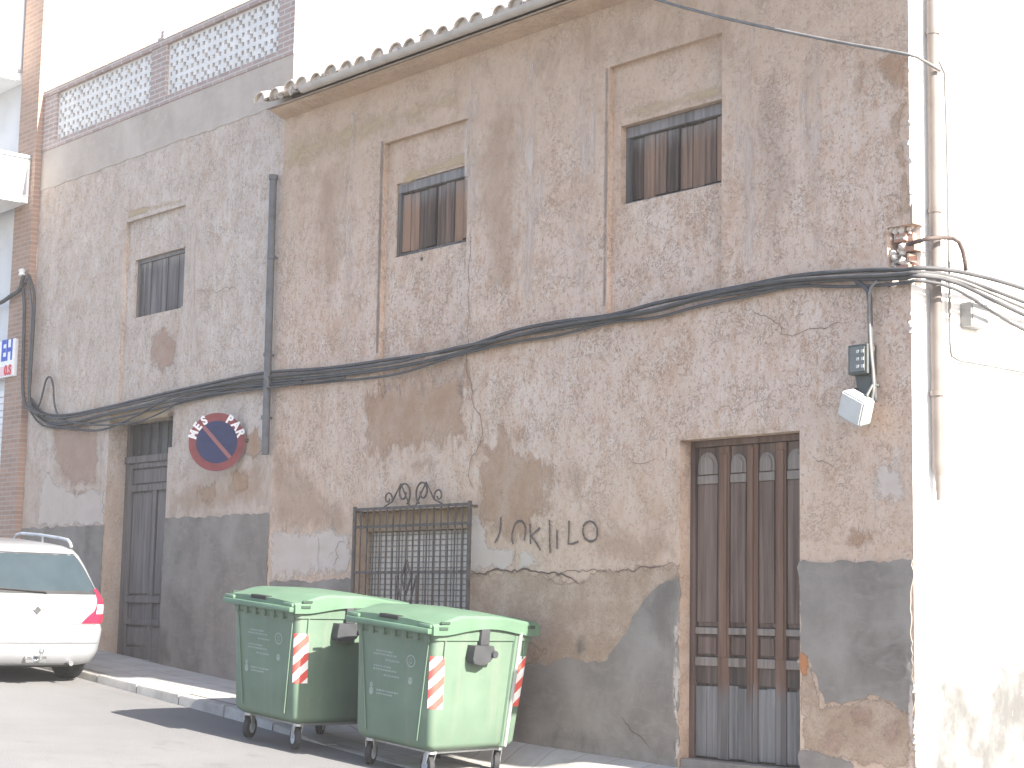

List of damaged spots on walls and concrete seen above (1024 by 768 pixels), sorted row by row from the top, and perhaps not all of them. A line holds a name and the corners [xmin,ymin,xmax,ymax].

crack [463,237,483,486]
crack [751,309,853,337]
peeling [365,374,466,460]
peeling [38,426,104,527]
peeling [271,527,351,582]
crack [471,544,673,585]
spalling [470,425,679,667]
spalling [797,658,920,768]